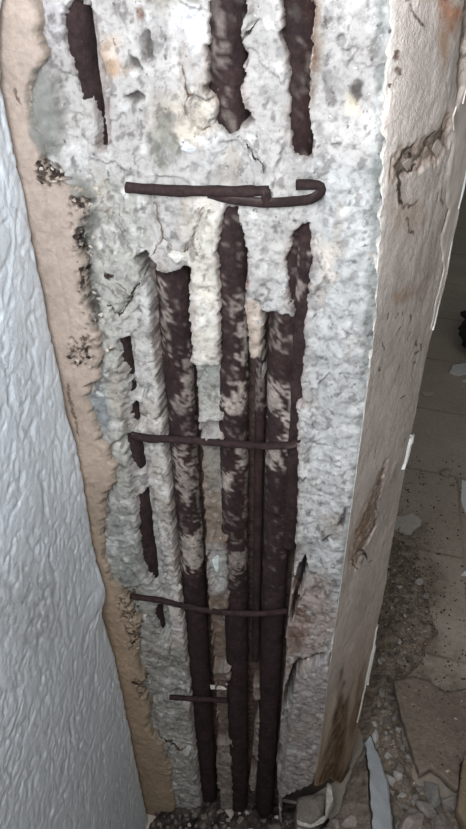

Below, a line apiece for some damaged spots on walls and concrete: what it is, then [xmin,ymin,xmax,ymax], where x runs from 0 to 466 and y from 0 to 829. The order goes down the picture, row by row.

crack [393,128,443,208]
spalling [33,0,401,823]
peeling [352,433,414,564]
peeling [394,513,422,535]
peeling [357,625,409,722]